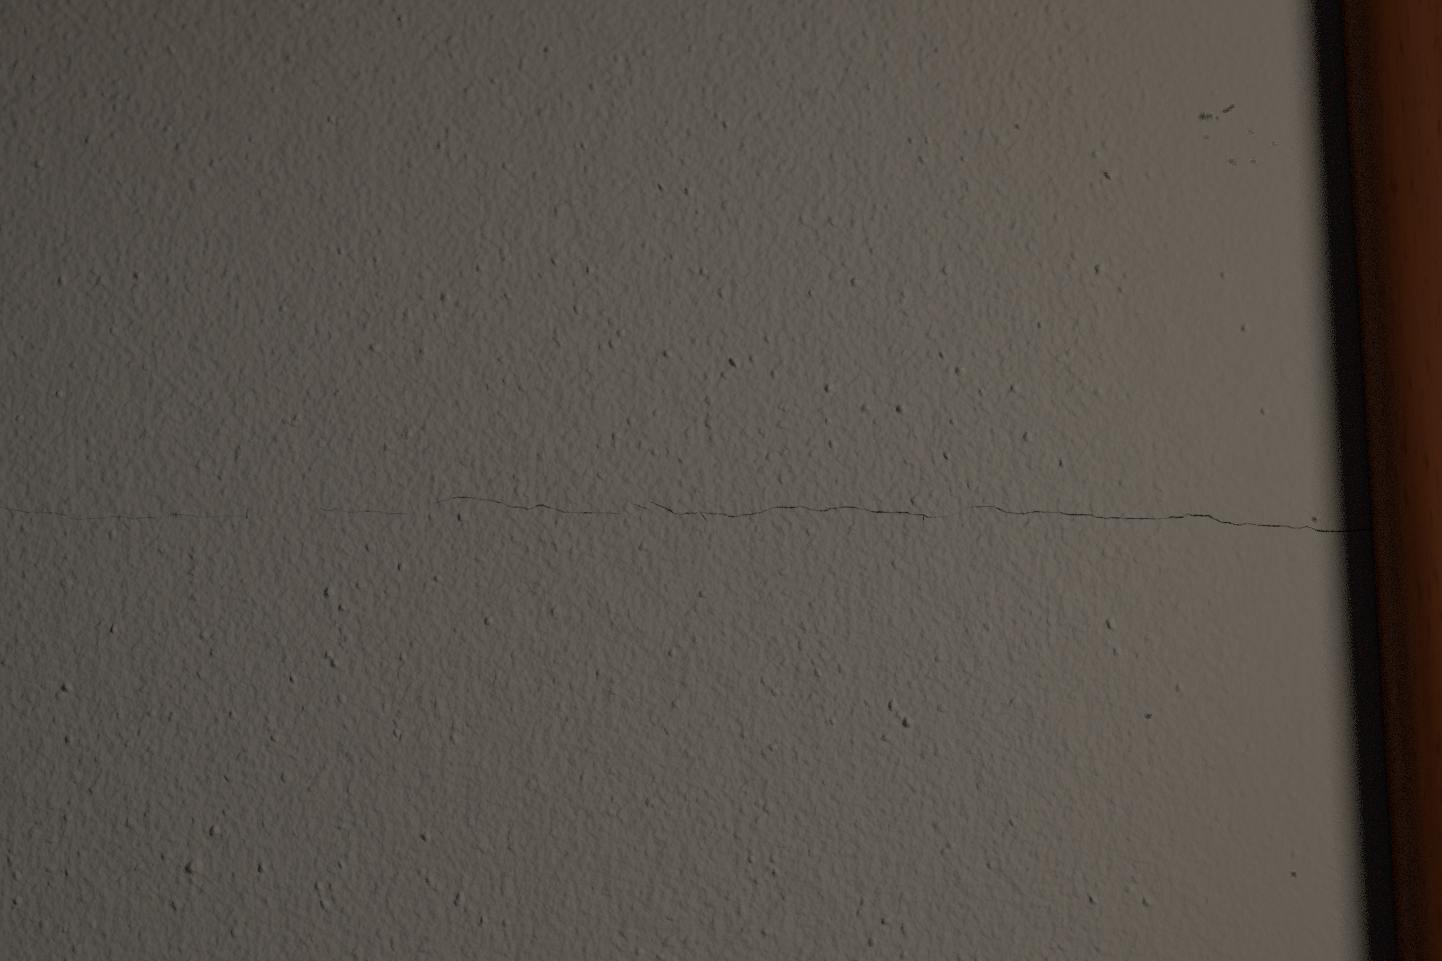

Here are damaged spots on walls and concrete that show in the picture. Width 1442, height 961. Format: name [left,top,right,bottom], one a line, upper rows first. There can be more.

crack [433,497,1370,532]